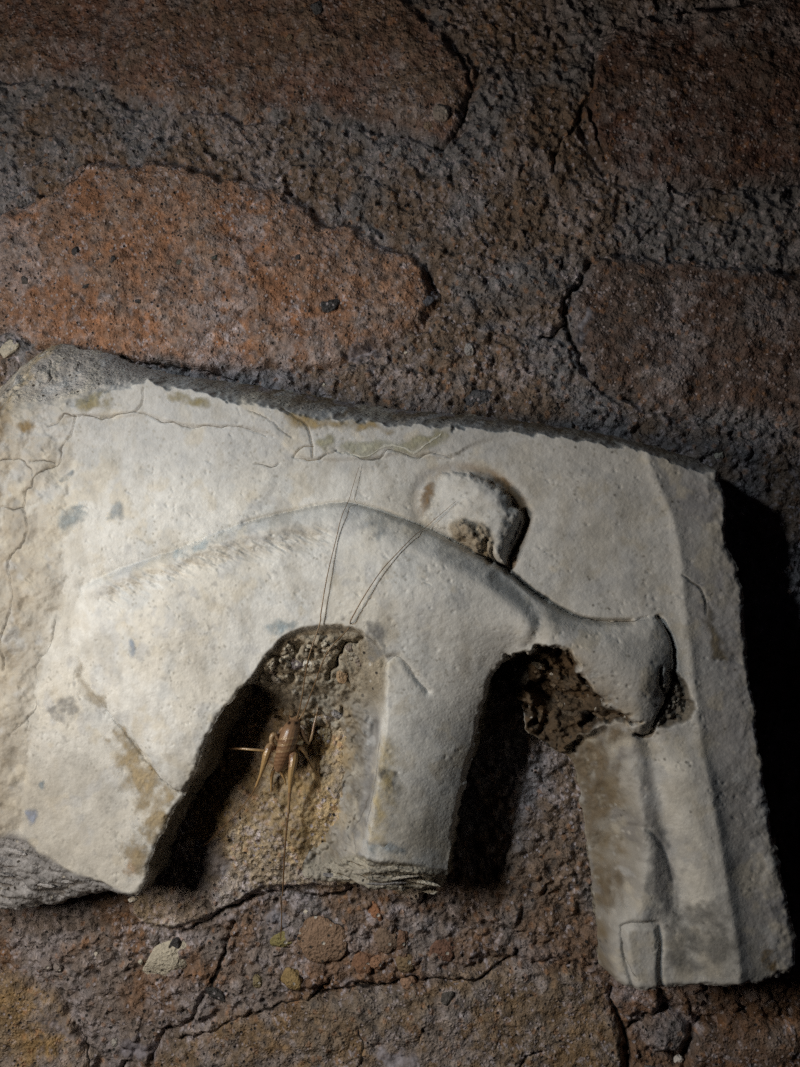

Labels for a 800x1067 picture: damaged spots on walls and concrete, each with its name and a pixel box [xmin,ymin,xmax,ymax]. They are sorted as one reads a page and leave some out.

crack [444,48,474,149]
crack [553,55,606,172]
crack [543,269,588,370]
crack [154,886,518,1052]
crack [81,1031,91,1067]
crack [608,991,663,1067]